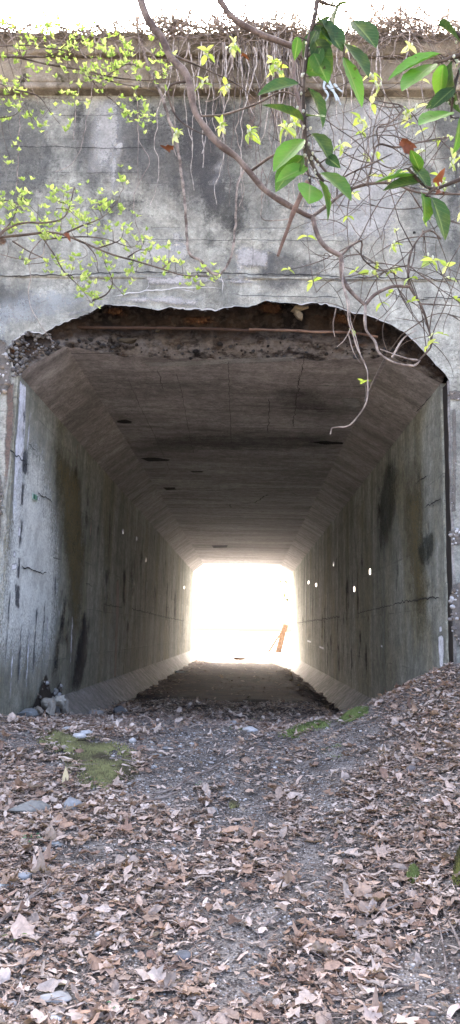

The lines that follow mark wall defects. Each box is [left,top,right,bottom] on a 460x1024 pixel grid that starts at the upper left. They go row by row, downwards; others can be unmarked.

water stain [95,103,123,182]
water stain [175,101,246,236]
water stain [134,233,187,262]
spalling [0,275,460,400]
water stain [0,382,90,691]
water stain [418,535,433,564]
crack [294,596,439,624]